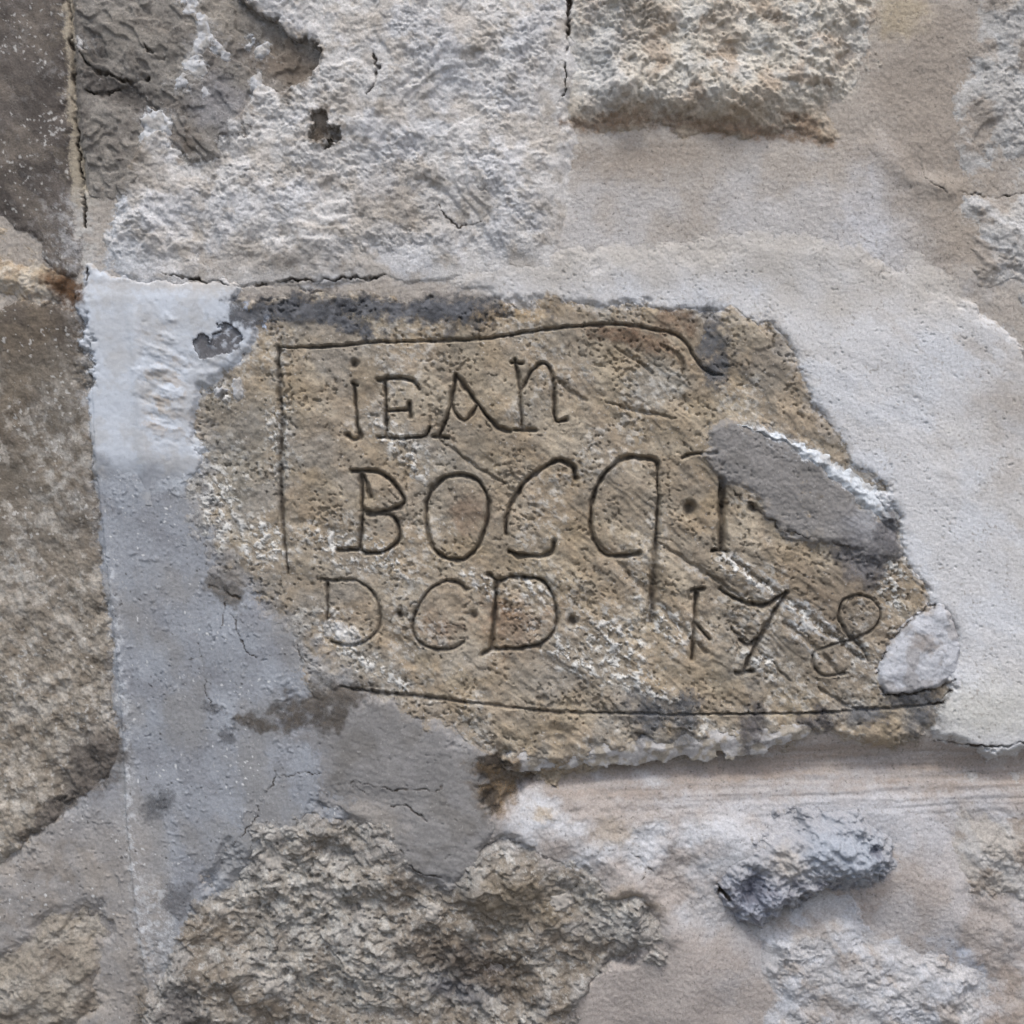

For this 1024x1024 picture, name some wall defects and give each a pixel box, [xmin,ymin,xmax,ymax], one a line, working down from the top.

spalling [309,111,341,149]
crack [77,129,88,228]
peeling [193,322,246,359]
peeling [214,377,244,401]
crack [212,585,257,658]